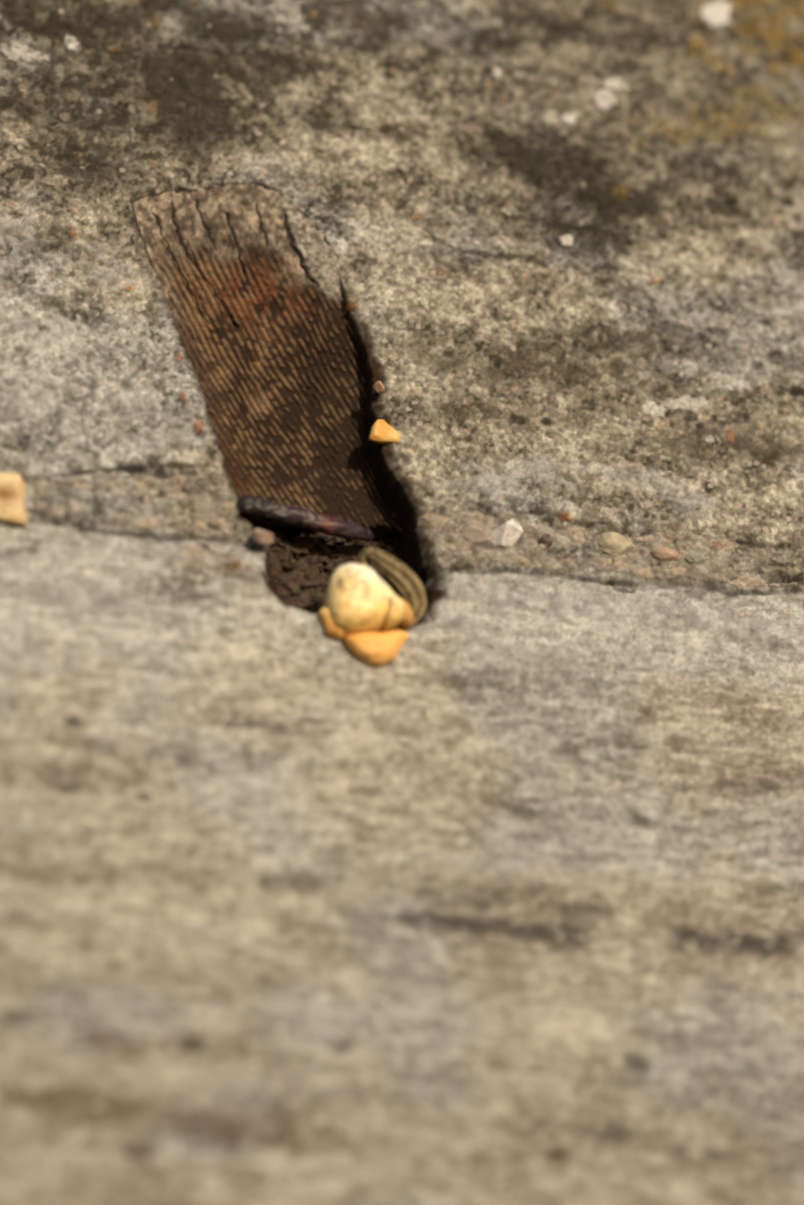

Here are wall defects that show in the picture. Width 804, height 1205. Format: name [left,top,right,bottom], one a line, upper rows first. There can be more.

spalling [33,475,235,536]